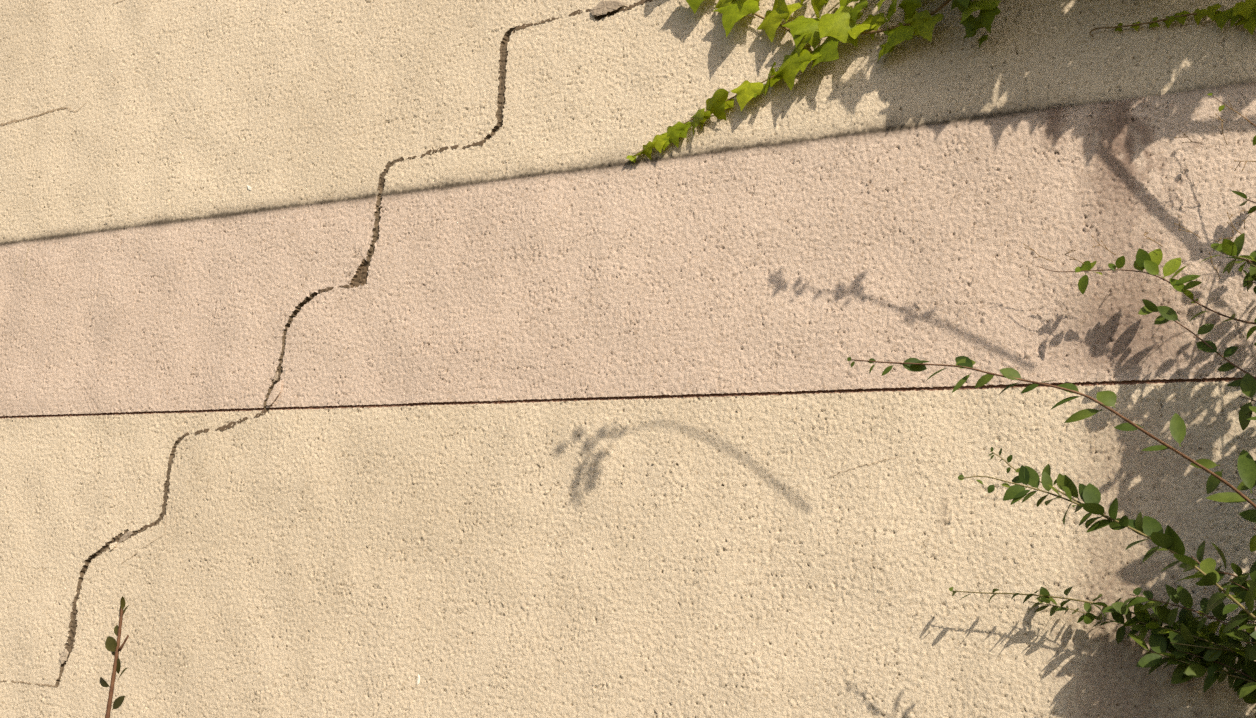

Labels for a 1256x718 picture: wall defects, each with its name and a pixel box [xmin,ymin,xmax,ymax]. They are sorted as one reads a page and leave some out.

crack [0,0,656,688]